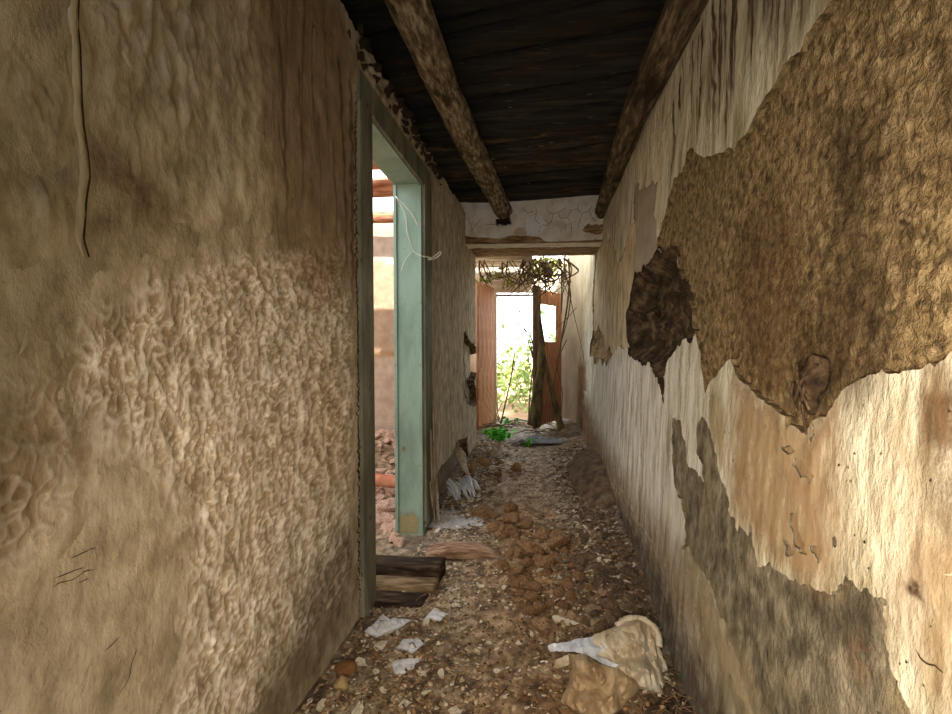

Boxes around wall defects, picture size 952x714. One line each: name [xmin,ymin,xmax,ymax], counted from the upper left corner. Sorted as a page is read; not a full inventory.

water stain [672,0,786,156]
spalling [582,0,952,451]
spalling [463,331,476,355]
spalling [464,365,477,408]
water stain [615,499,724,714]
water stain [910,544,952,650]